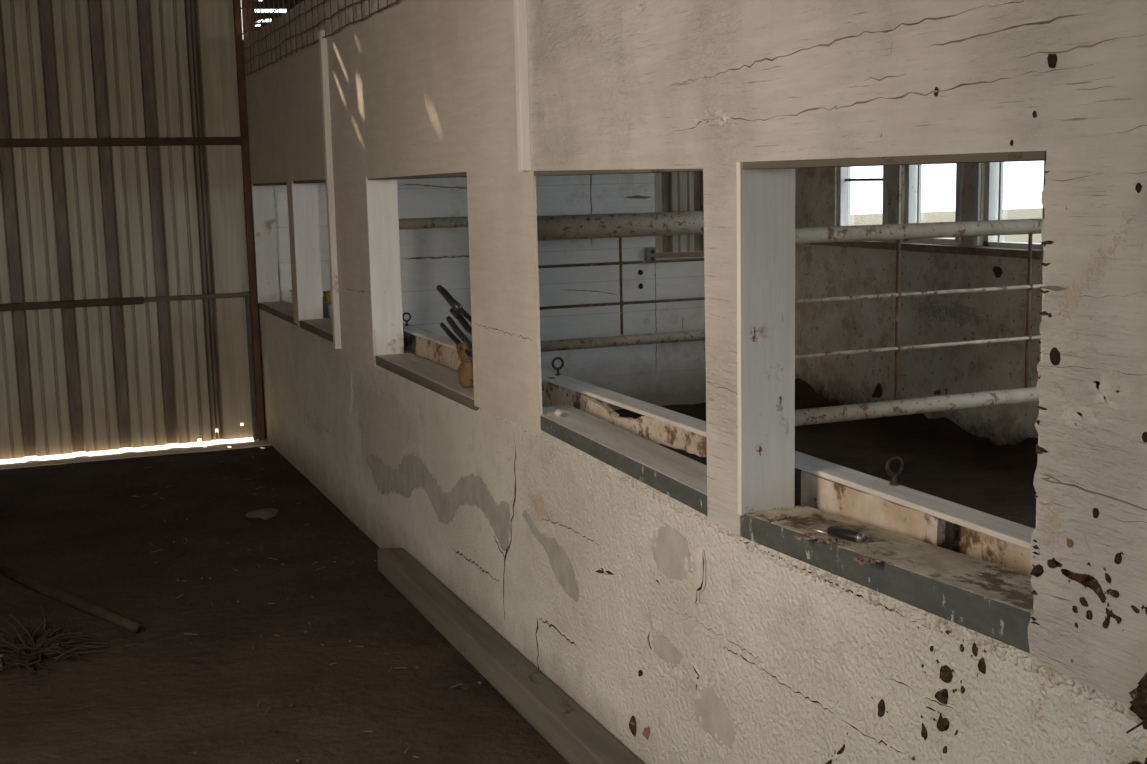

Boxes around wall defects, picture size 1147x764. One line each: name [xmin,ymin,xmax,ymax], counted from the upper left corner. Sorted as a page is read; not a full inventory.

crack [663,0,1147,136]
peeling [367,452,579,602]
crack [451,431,614,621]
spalling [479,408,1143,724]
crack [535,616,579,670]
peeling [694,672,738,762]
crack [674,608,923,764]